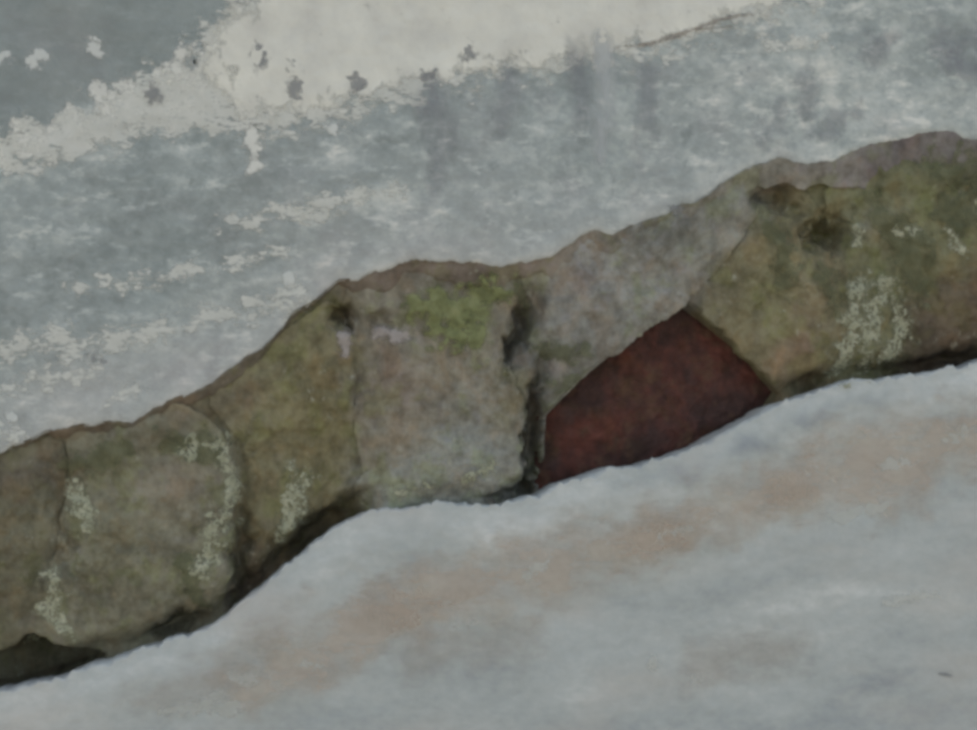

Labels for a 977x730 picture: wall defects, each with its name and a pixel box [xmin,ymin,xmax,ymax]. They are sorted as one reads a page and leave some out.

peeling [0,0,826,177]
spalling [0,130,977,687]